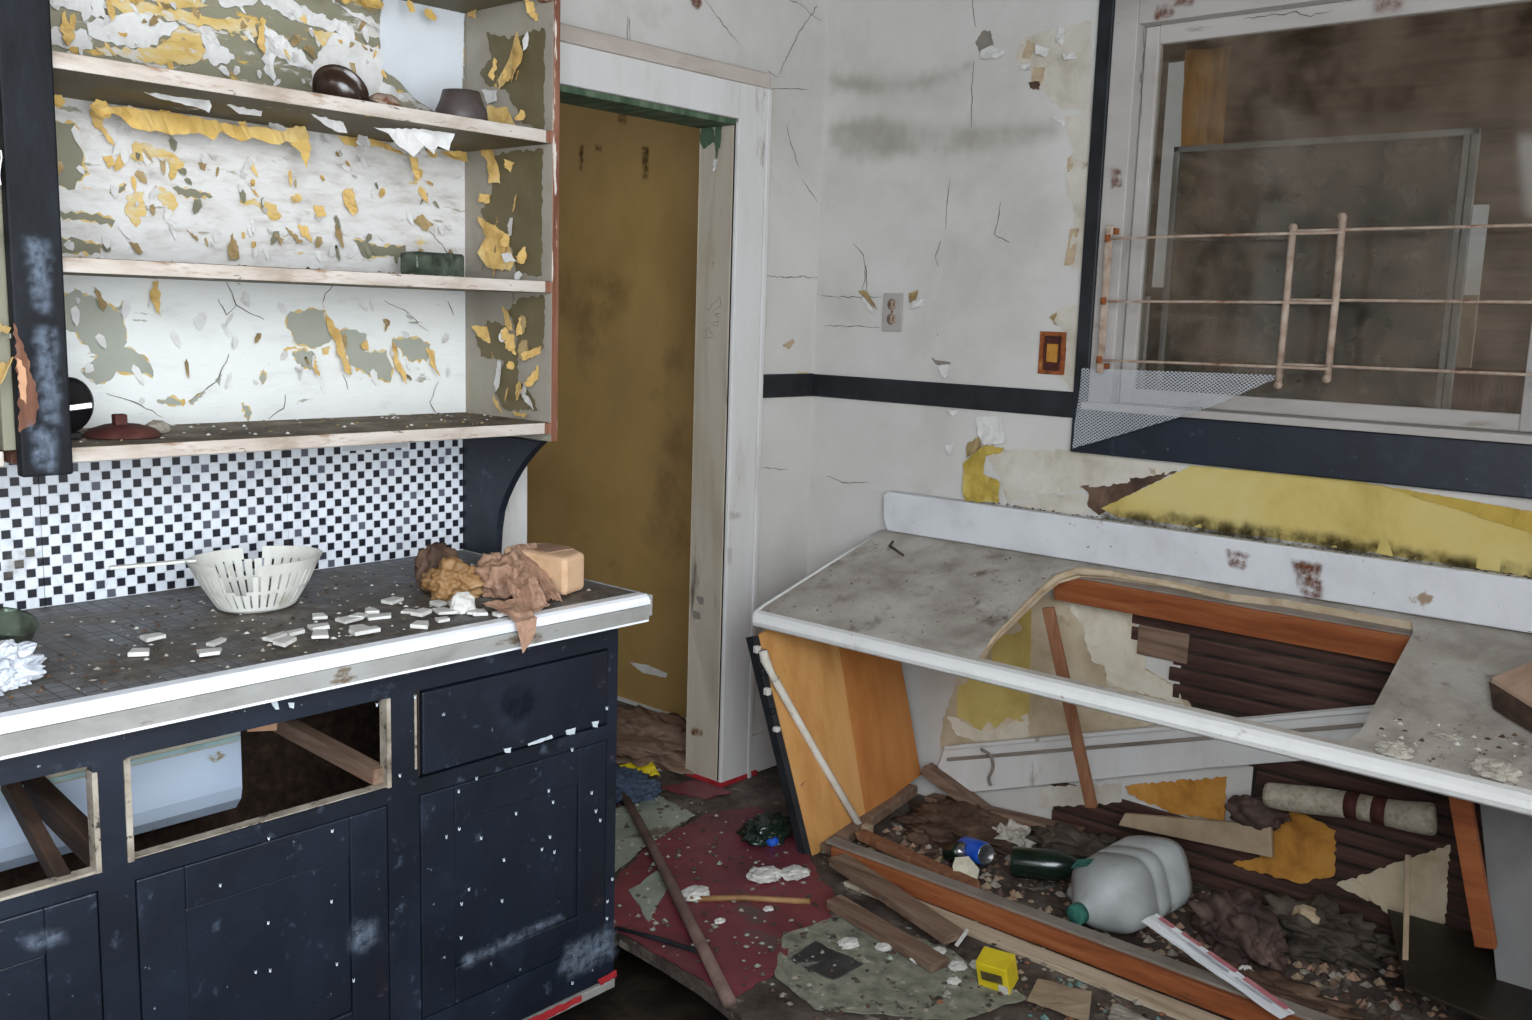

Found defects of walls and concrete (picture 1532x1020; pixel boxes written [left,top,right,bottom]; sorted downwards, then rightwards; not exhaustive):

peeling [50,0,546,129]
crack [968,64,976,129]
peeling [975,21,1092,271]
peeling [54,92,545,418]
peeling [0,323,40,433]
peeling [241,402,252,421]
flaking render [945,409,1532,577]
damp [1104,515,1501,573]
rust [1294,561,1321,597]
peeling [984,608,1032,669]
peeling [957,678,1030,730]